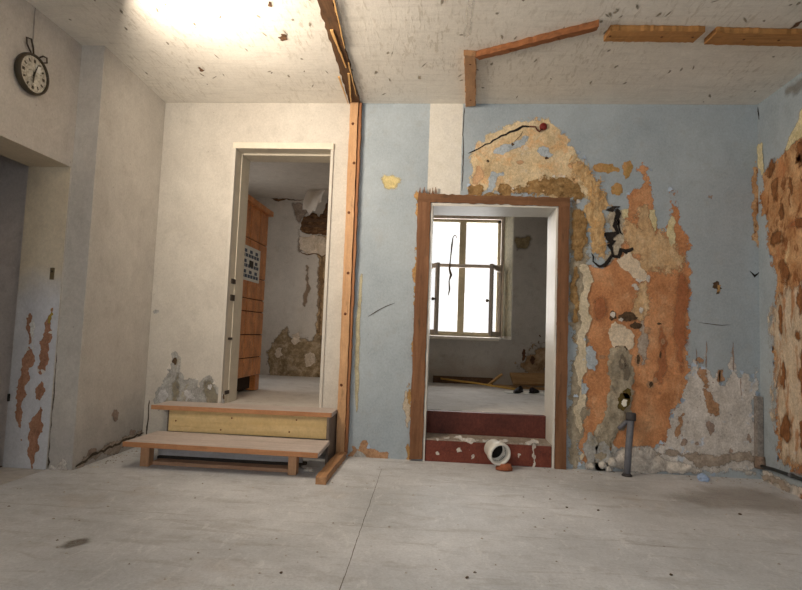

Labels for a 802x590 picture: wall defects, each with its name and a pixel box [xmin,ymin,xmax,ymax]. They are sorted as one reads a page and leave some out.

crack [461,108,529,184]
spalling [300,202,328,235]
crack [591,206,634,268]
peeling [467,109,802,499]
peeling [15,308,53,469]
peeling [153,351,225,414]
peeling [348,440,389,459]